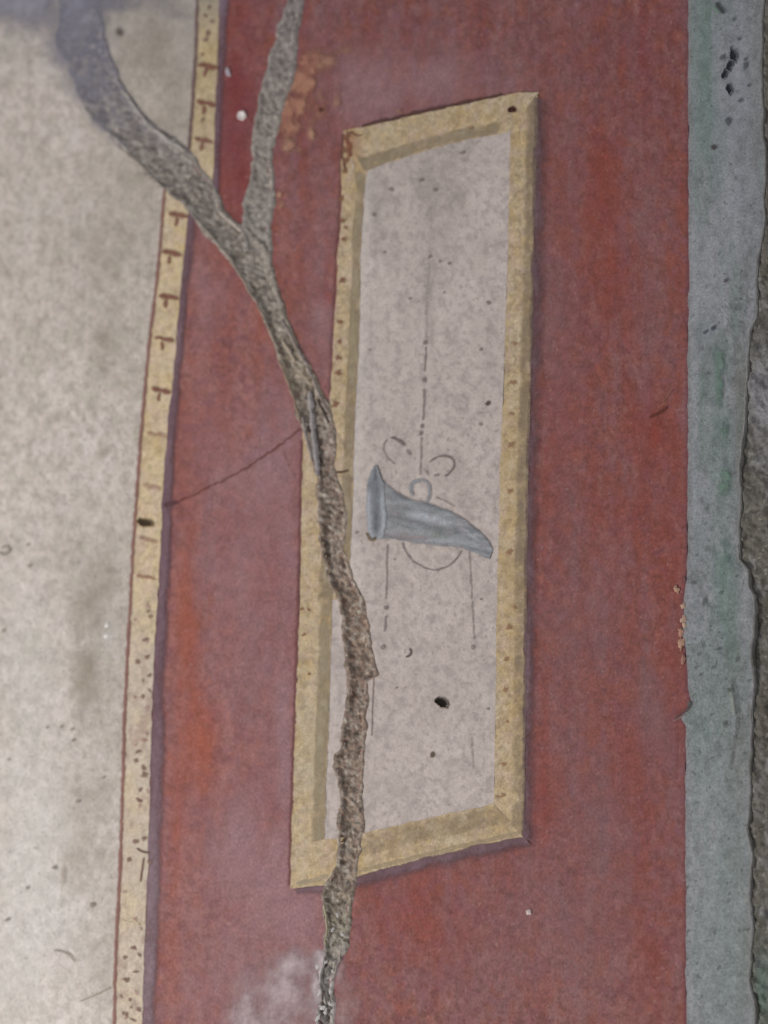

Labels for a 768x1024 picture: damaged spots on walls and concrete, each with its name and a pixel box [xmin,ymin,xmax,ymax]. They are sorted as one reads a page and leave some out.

crack [55,0,379,1024]